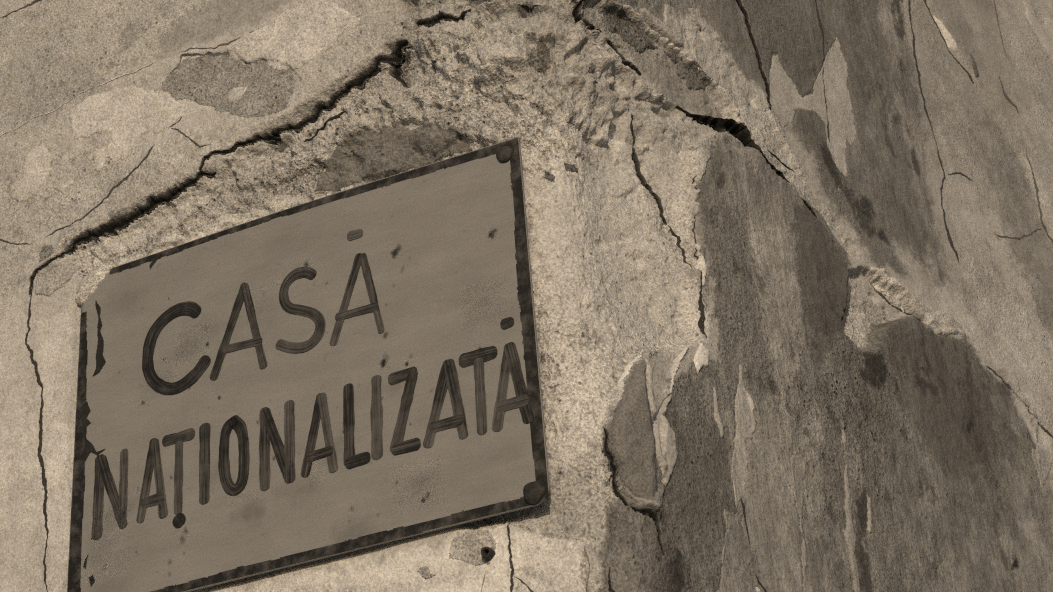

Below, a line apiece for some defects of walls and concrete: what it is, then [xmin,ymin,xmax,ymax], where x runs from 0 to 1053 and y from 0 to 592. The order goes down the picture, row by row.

flaking render [69,0,360,172]
crack [628,108,707,338]
spalling [602,2,740,116]
crack [677,106,817,218]
flaking render [769,37,857,176]
damp [822,146,888,241]
damp [891,0,905,39]
crack [0,9,471,592]
flaking render [617,343,709,488]
damp [860,353,887,387]
crack [481,522,534,592]
damp [857,488,871,592]